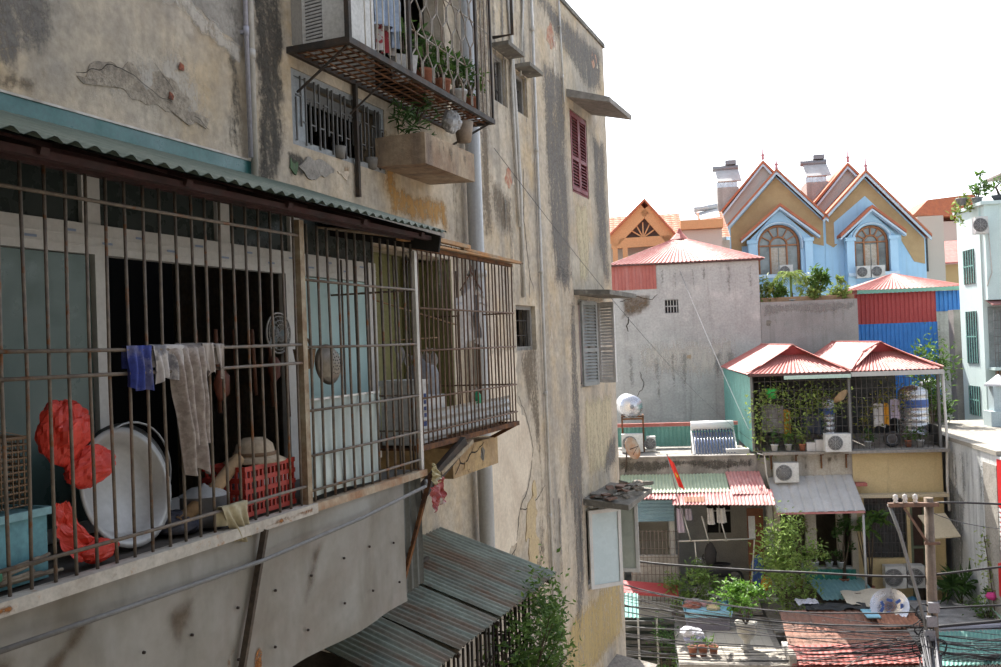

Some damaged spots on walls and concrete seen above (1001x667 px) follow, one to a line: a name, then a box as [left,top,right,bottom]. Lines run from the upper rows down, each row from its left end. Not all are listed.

water stain [0,0,49,64]
spalling [77,55,209,129]
water stain [255,0,284,179]